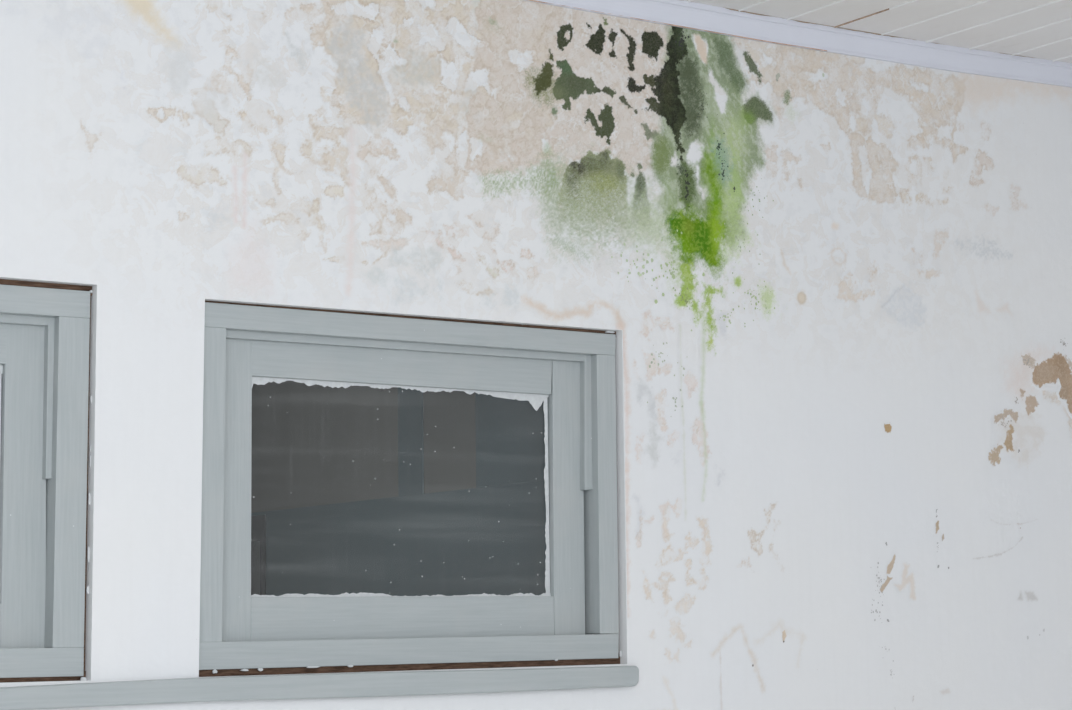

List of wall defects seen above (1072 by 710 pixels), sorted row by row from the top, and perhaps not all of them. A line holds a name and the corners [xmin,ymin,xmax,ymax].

peeling [145,0,665,325]
leakage [471,14,699,276]
mould [741,49,804,129]
peeling [736,37,996,209]
spalling [988,335,1072,473]